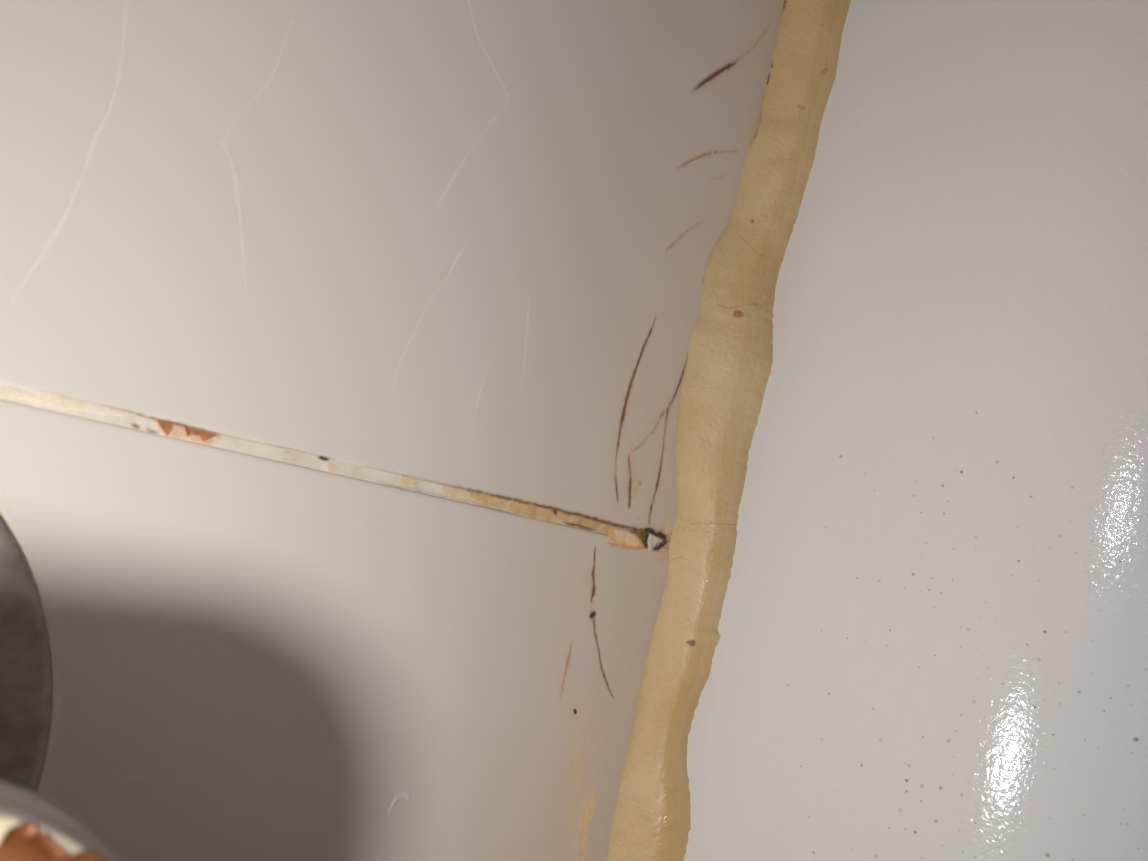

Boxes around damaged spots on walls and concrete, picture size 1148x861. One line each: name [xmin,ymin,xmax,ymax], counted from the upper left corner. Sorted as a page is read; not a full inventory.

crack [697,63,735,88]
crack [655,364,686,429]
crack [129,411,207,432]
corrosion [132,421,216,443]
crack [455,328,662,696]